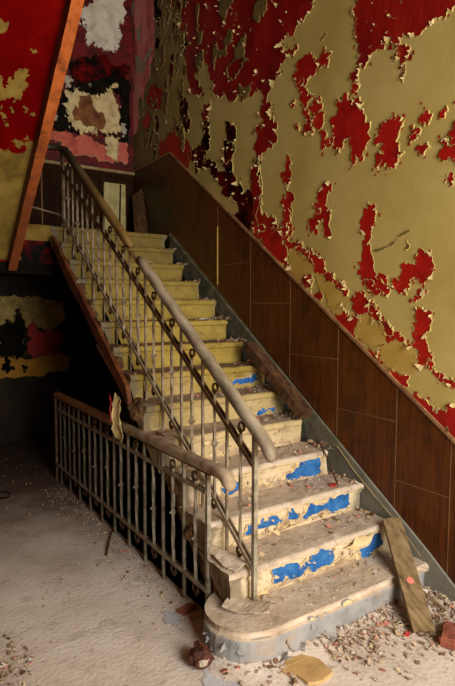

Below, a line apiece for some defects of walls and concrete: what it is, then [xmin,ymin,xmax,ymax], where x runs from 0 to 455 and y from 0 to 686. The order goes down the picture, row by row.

flaking render [79,0,128,53]
peeling [0,68,36,127]
flaking render [50,75,129,165]
peeling [138,0,455,438]
peeling [0,295,70,378]
peeling [211,455,323,502]
peeling [230,483,350,547]
peeling [257,532,383,598]